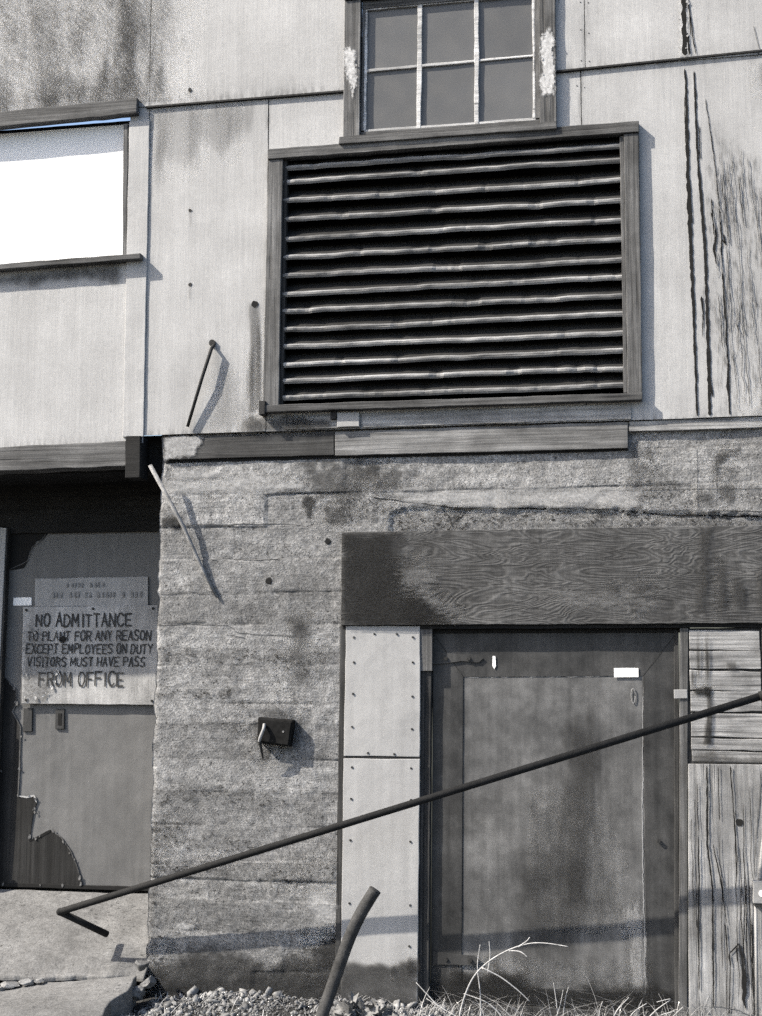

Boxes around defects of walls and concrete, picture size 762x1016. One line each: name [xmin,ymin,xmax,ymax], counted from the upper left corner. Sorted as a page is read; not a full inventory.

water stain [41,0,143,106]
peeling [343,47,357,97]
peeling [539,29,555,96]
water stain [173,459,402,521]
water stain [342,532,442,624]
peeling [0,668,82,888]
crack [691,766,761,1016]